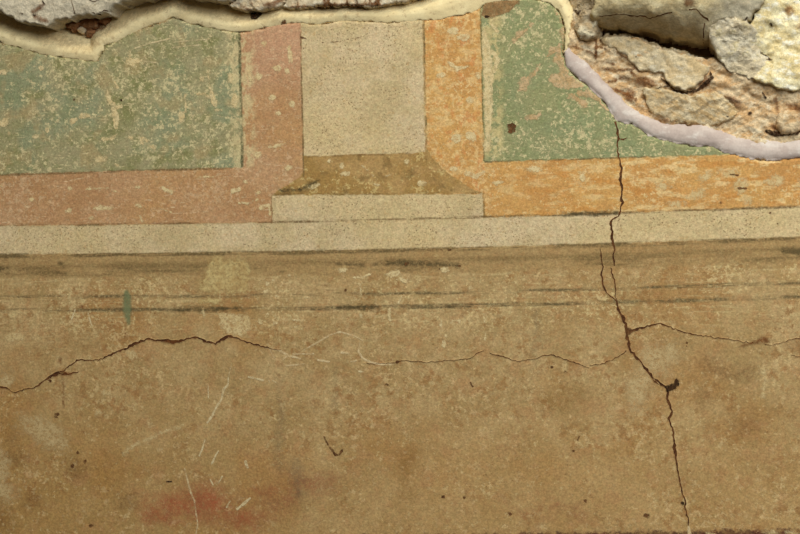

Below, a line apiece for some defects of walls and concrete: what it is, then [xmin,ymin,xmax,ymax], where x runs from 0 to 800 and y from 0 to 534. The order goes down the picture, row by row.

crack [0,117,800,534]